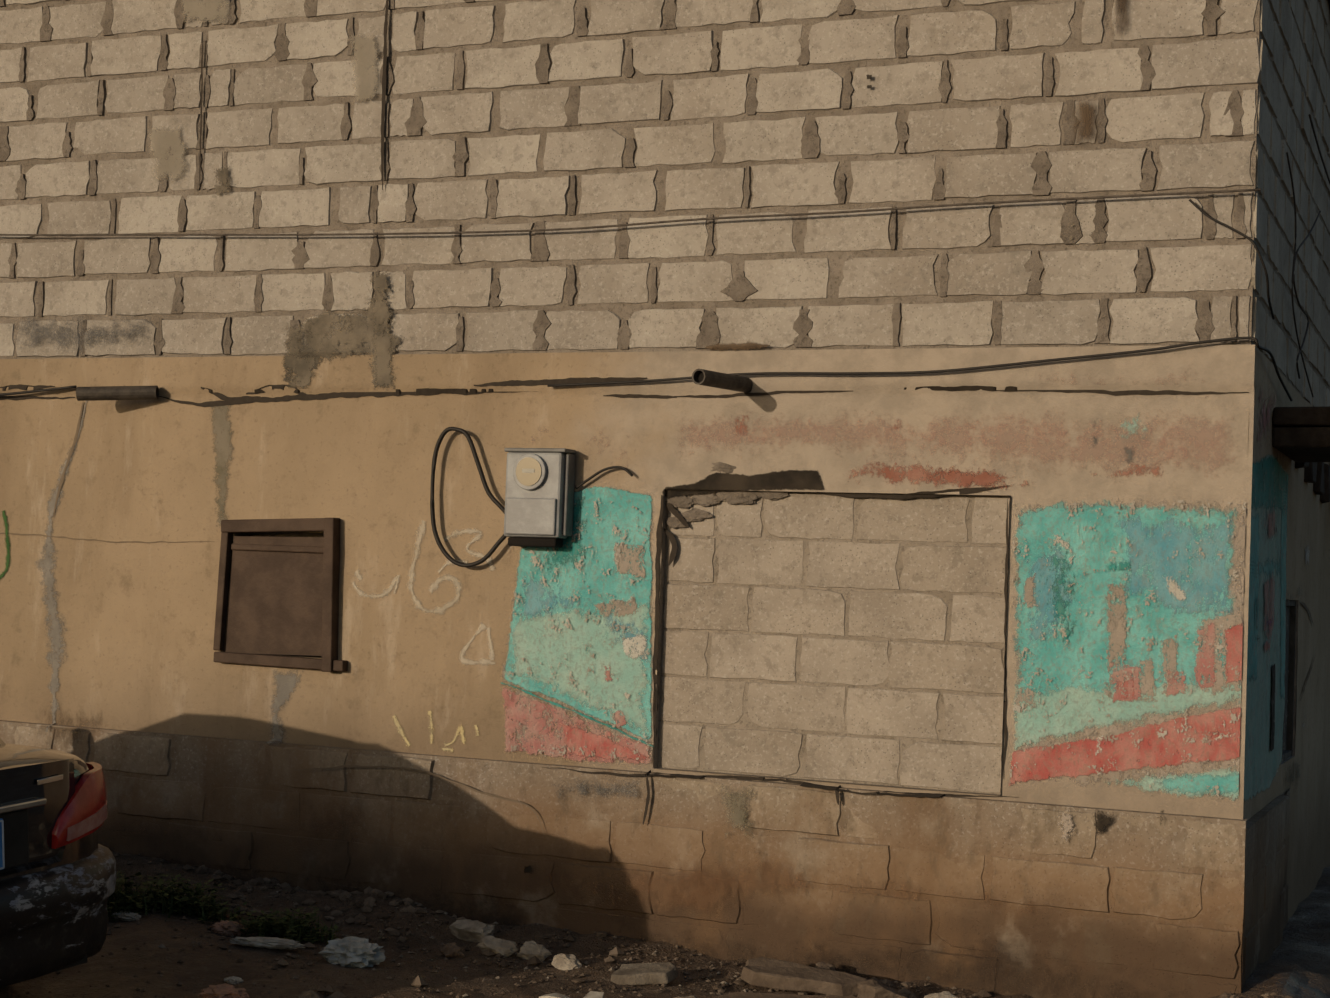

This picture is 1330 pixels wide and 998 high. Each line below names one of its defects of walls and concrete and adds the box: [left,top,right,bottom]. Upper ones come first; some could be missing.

spalling [662,462,824,529]